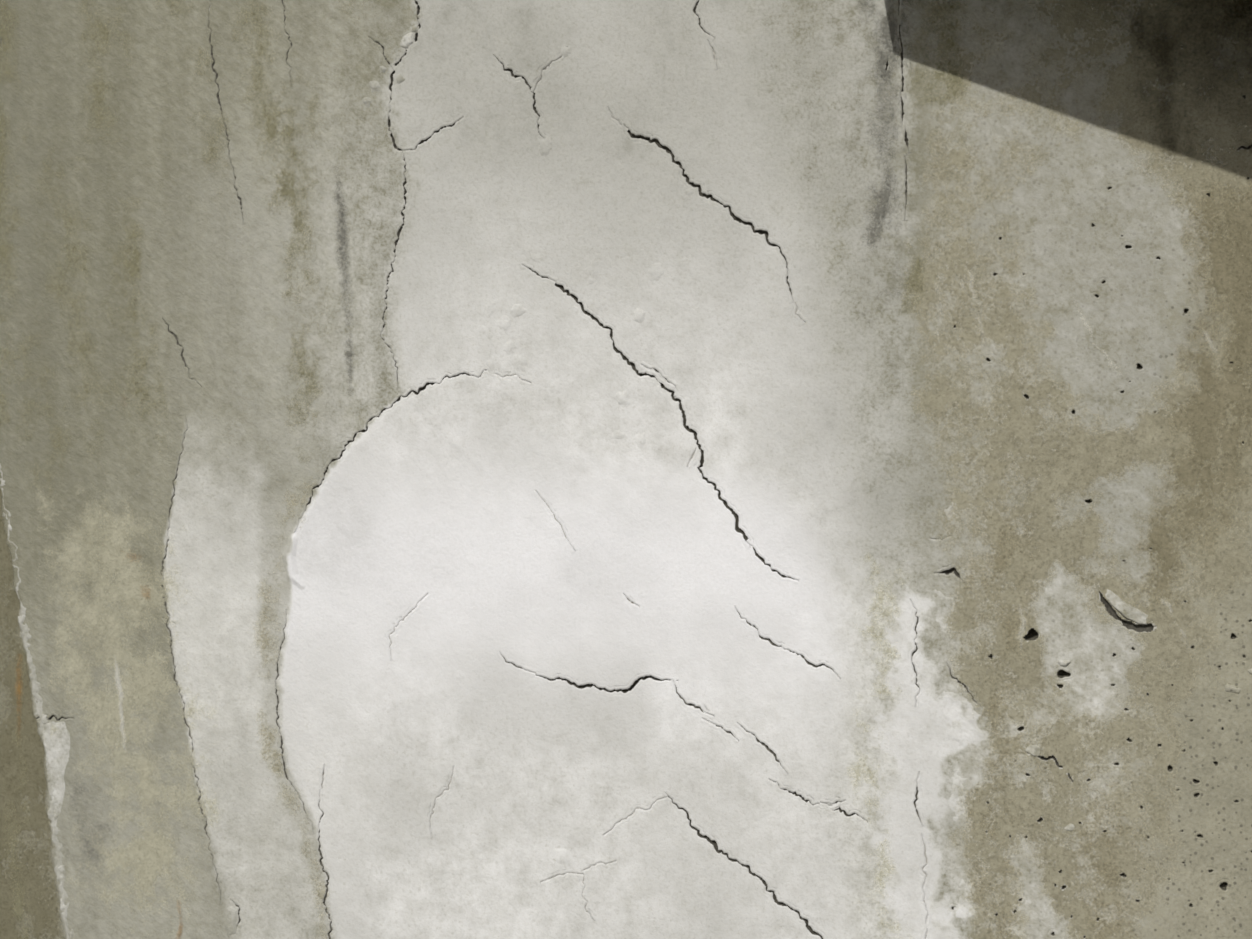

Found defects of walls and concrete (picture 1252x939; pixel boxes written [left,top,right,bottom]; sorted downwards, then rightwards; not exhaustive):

damp [0,488,65,939]
flaking render [0,463,75,939]
damp [48,498,218,912]
damp [234,0,321,302]
damp [334,179,353,394]
crack [290,0,532,535]
crack [520,261,800,585]
crack [496,649,870,825]
crack [539,790,827,939]
crack [603,104,808,325]
damp [859,0,1252,939]
spalling [1099,589,1158,636]